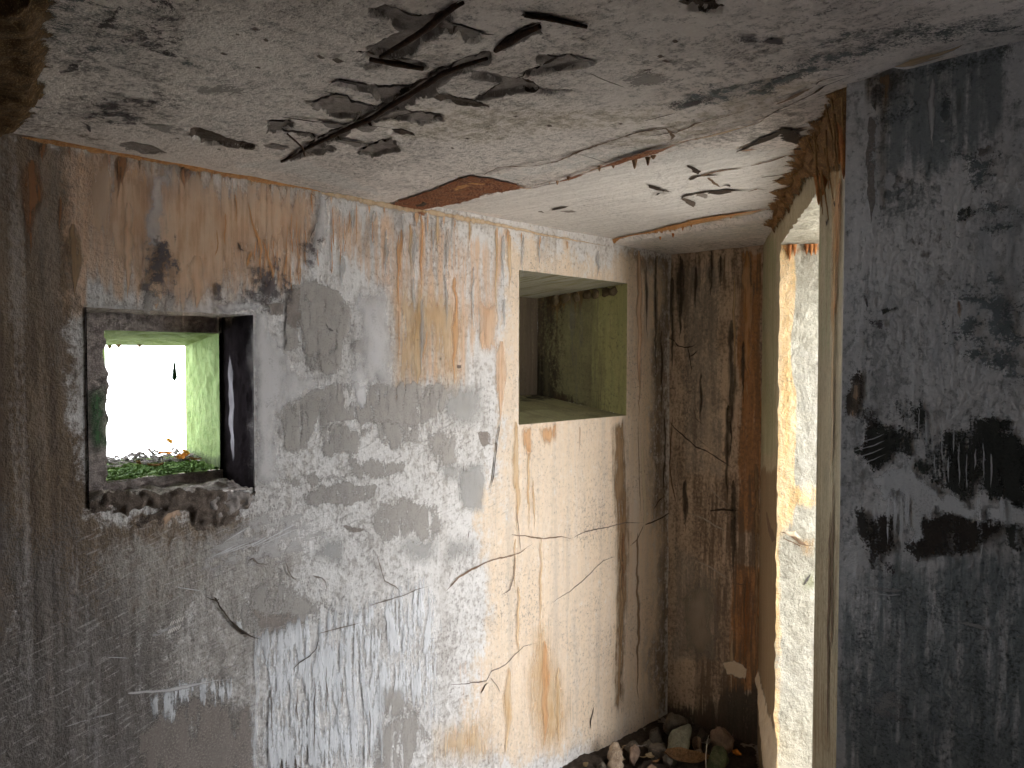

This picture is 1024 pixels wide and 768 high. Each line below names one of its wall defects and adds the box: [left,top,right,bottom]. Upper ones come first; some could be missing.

spalling [144,0,597,163]
corrosion [0,0,847,456]
spalling [86,487,256,531]
crack [207,597,262,640]
crack [452,643,536,693]
crack [294,338,738,668]
corrosion [505,423,556,754]
corrosion [531,540,563,745]
water stain [636,250,722,488]
water stain [725,320,745,585]
peeling [852,399,1024,579]
water stain [941,271,1024,395]